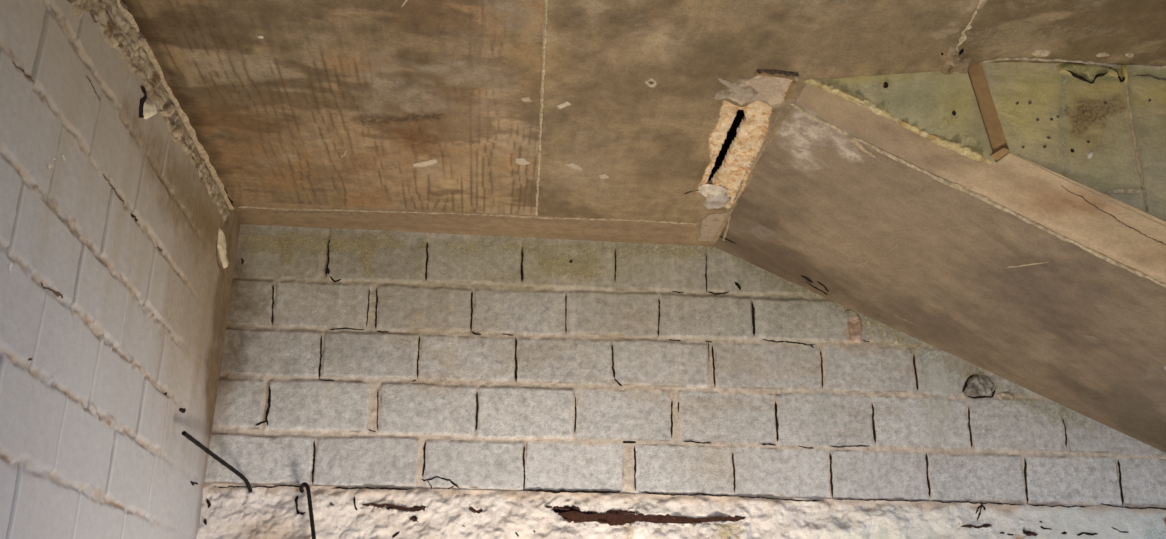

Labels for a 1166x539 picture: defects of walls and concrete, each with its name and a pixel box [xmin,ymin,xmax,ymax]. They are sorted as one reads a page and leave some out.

crack [1133,73,1166,81]
spalling [67,0,230,269]
leakage [412,159,438,167]
spalling [684,69,993,212]
crack [1061,185,1166,245]